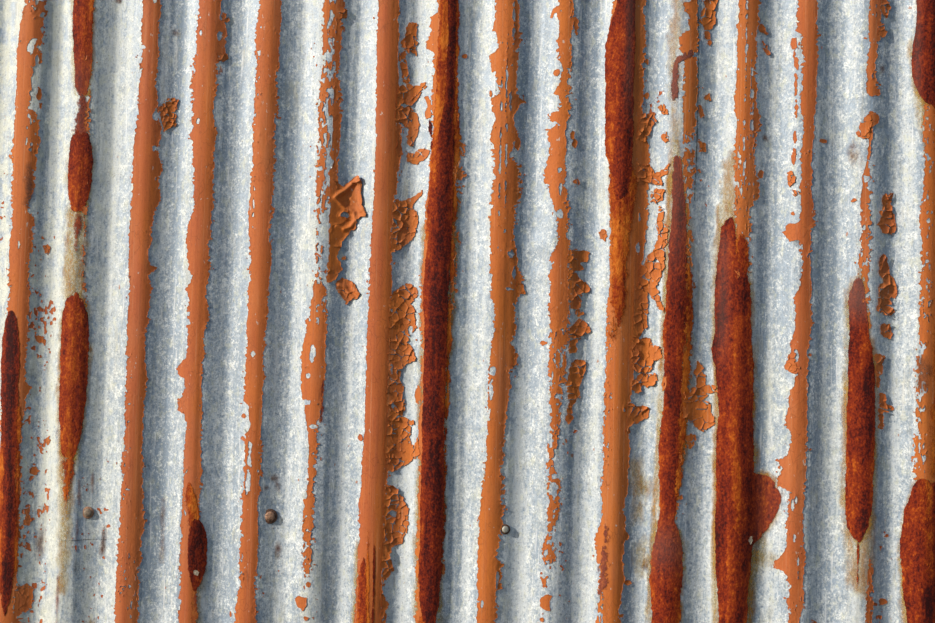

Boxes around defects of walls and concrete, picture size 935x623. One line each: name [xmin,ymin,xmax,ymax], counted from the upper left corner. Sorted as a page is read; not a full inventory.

peeling [0,0,50,623]
rust [57,0,94,592]
peeling [114,0,230,623]
peeling [295,0,467,623]
rust [414,0,462,623]
peeling [540,0,591,564]
rust [605,0,639,341]
peeling [590,0,669,623]
rust [633,155,694,623]
rust [711,153,781,623]
peeling [773,0,827,623]
rust [898,351,935,623]